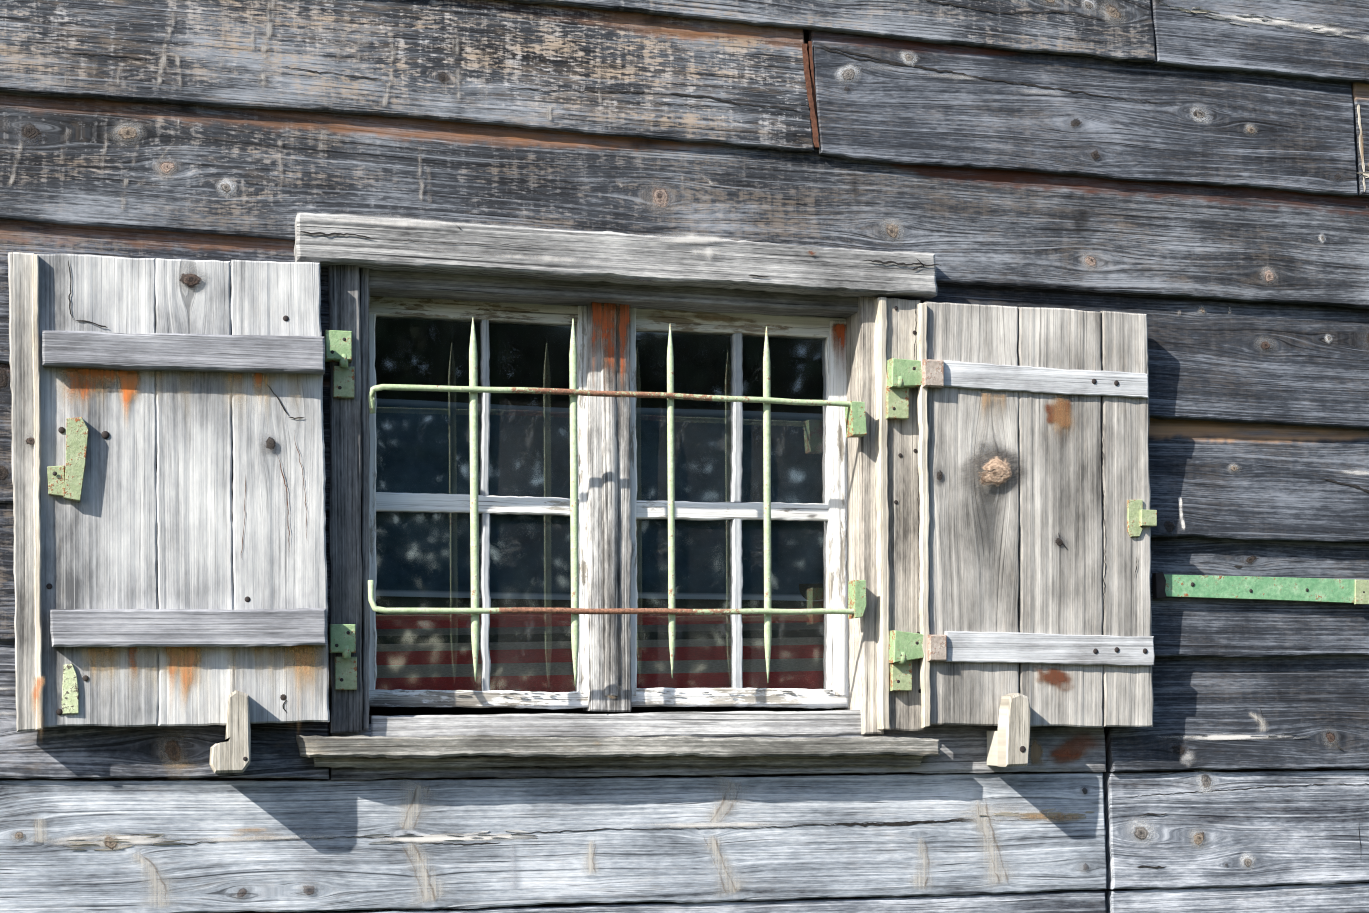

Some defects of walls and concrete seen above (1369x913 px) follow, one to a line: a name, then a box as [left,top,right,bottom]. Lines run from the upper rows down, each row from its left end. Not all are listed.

crack [68,257,107,328]
corrosion [591,302,630,380]
corrosion [63,368,139,409]
corrosion [1045,400,1070,427]
corrosion [87,647,137,671]
corrosion [165,647,201,689]
corrosion [255,645,315,673]
corrosion [1038,668,1070,687]